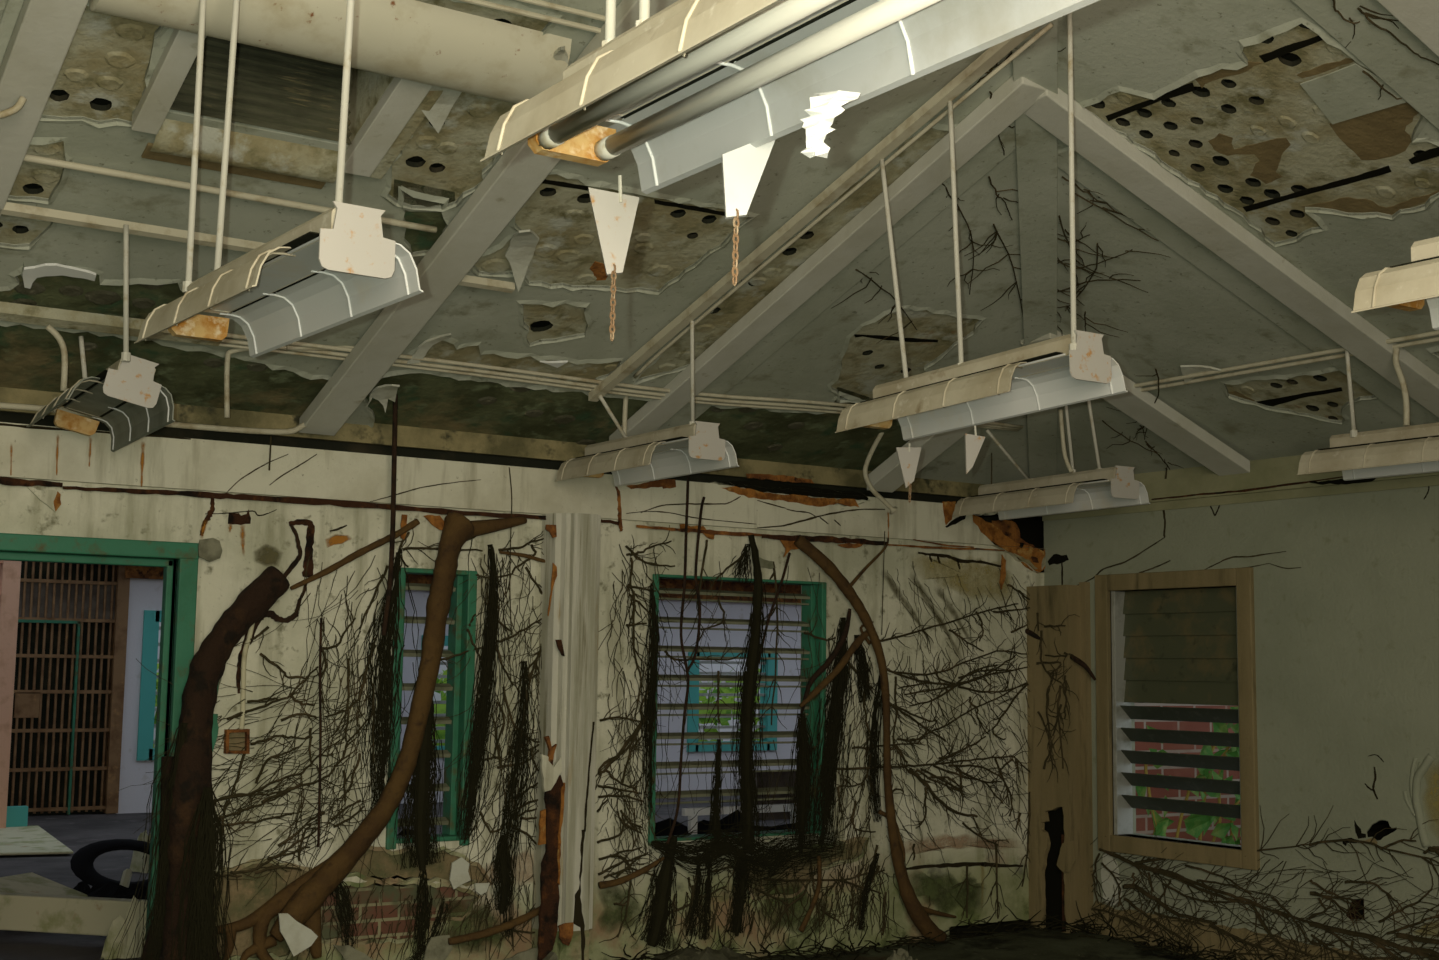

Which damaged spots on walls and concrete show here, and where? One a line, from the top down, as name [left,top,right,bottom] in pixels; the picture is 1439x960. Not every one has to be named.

peeling [505,229,539,292]
spalling [942,501,1069,573]
spalling [537,736,574,960]